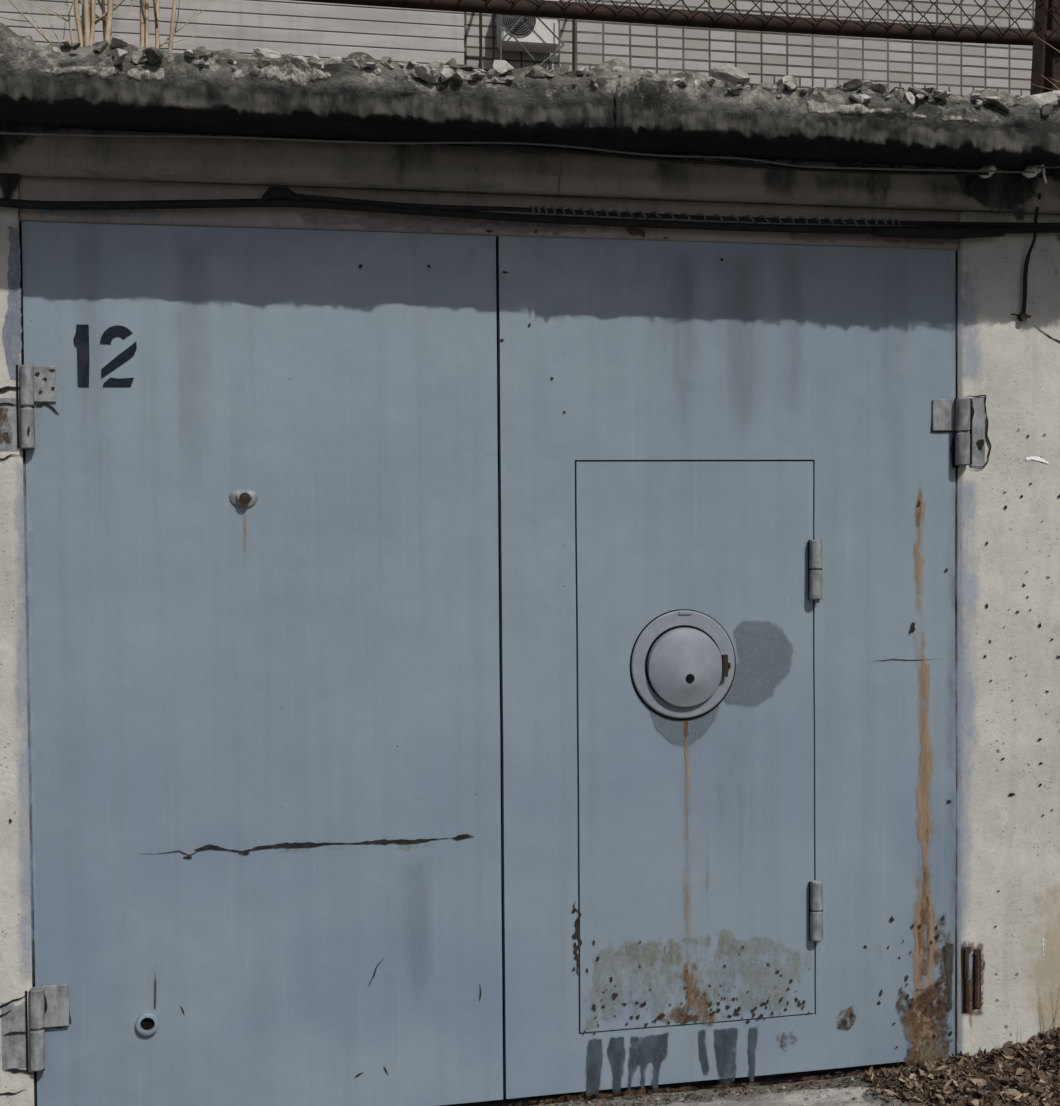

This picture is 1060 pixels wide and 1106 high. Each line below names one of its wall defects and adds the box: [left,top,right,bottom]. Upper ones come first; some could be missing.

damp [0,76,1060,158]
damp [0,173,20,199]
damp [954,166,1060,221]
corrosion [914,488,923,601]
crack [149,834,474,859]
corrosion [893,658,985,1068]
peeling [583,959,810,1035]